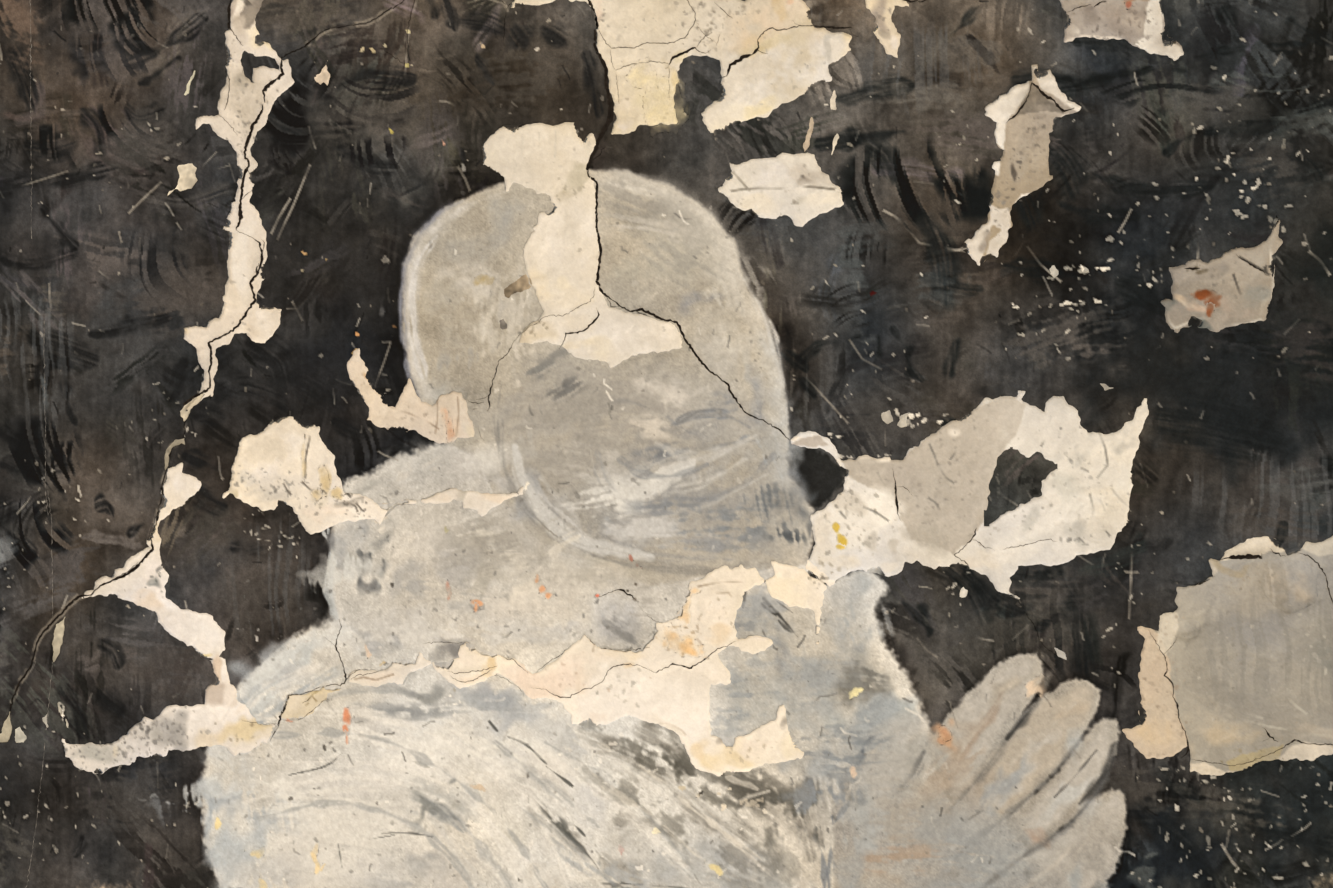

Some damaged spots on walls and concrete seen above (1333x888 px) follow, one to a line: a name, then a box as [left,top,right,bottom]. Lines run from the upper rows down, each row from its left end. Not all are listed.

peeling [180,0,294,421]
peeling [480,122,683,368]
crack [469,0,858,438]
peeling [510,0,852,137]
peeling [718,117,846,227]
peeling [963,64,1081,266]
crack [0,0,415,740]
peeling [347,348,475,444]
crack [425,589,735,698]
peeling [42,390,1149,776]
peeling [1122,536,1333,776]
crack [1192,549,1333,603]